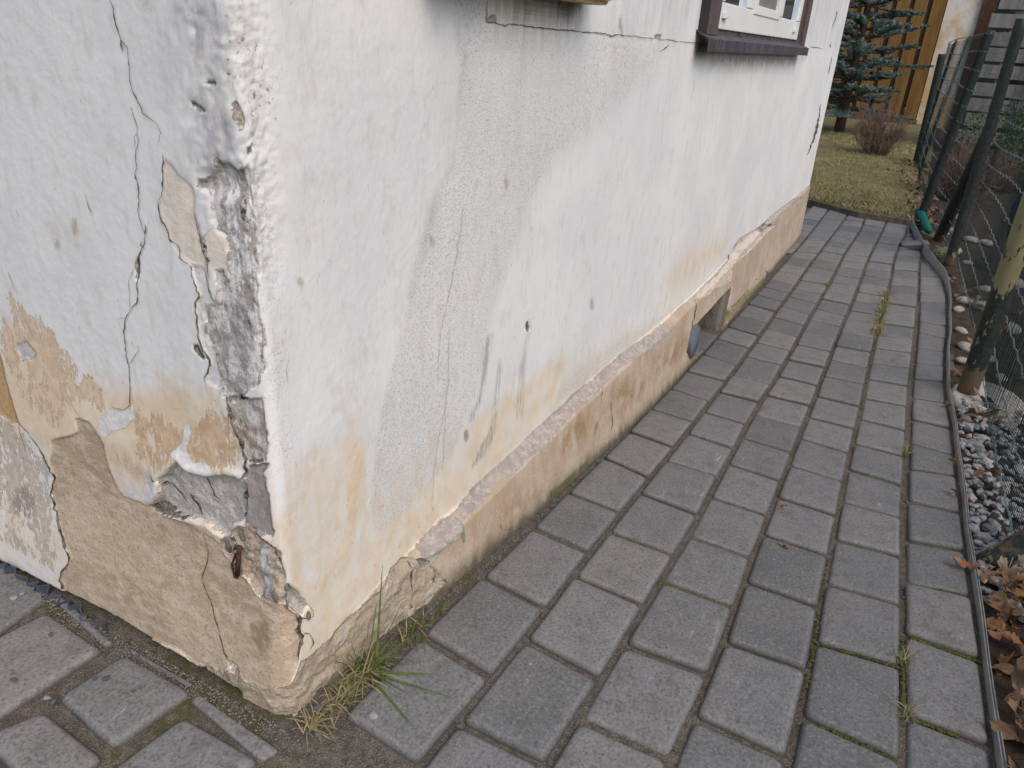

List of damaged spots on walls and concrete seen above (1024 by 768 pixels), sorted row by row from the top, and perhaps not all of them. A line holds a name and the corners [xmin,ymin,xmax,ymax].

crack [486,1,699,51]
crack [110,1,219,411]
crack [807,106,821,155]
flaking render [0,155,671,717]
crack [150,471,286,660]